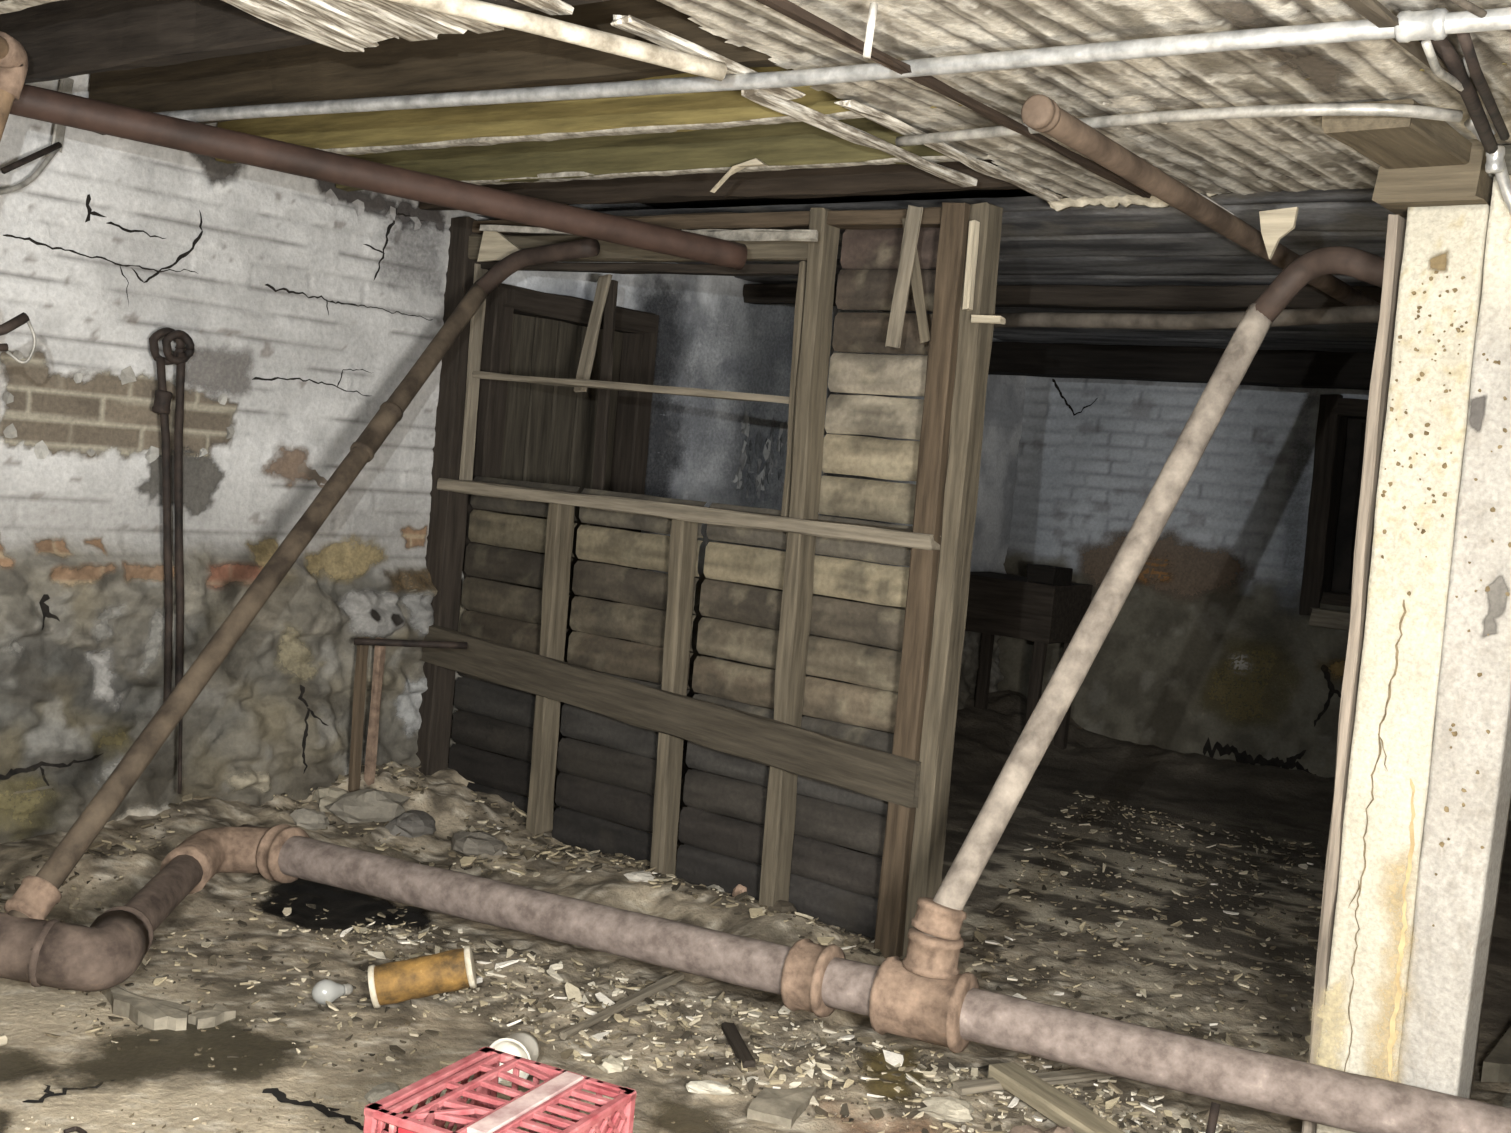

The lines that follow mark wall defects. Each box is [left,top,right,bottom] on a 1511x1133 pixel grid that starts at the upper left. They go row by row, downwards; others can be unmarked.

crack [3,194,203,307]
crack [265,208,433,321]
peeling [0,349,251,515]
flaking render [35,539,175,586]
flaking render [206,563,263,589]
flaking render [401,526,427,549]
peeling [1467,576,1510,637]
crack [1344,600,1406,1072]
corrosion [1372,779,1415,1081]
leakage [0,1018,303,1090]
leakage [0,1110,11,1133]
crack [262,1088,364,1130]